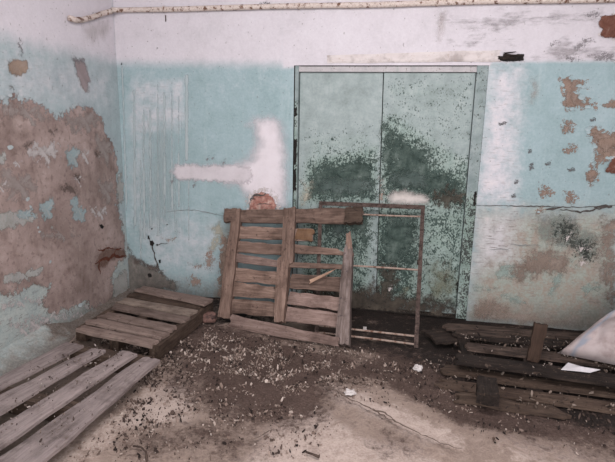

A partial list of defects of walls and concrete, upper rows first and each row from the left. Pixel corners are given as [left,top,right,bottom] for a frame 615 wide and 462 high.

spalling [598,13,615,41]
peeling [8,58,30,77]
peeling [71,56,91,93]
peeling [558,76,615,187]
damp [121,67,189,291]
peeling [0,86,128,314]
spalling [245,187,281,210]
crack [476,204,614,213]
peeling [535,184,580,215]
crack [148,228,168,270]
damp [551,219,599,268]